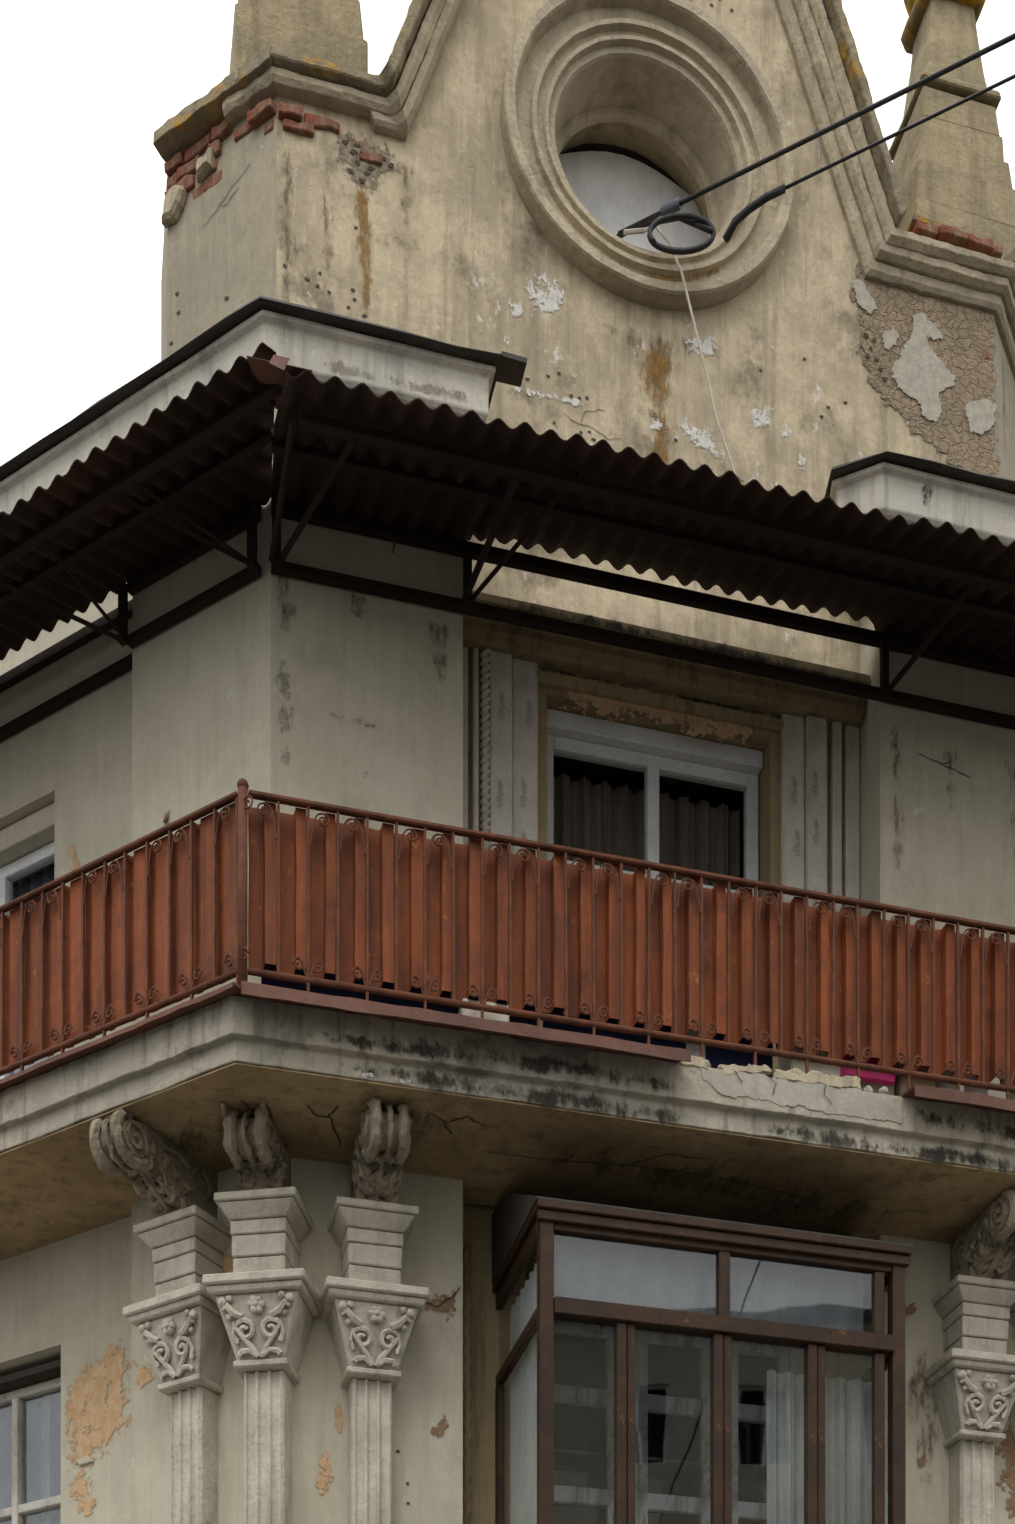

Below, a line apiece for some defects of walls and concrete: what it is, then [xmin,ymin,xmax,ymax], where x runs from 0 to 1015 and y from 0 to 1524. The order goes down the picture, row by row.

flaking render [161,98,400,229]
flaking render [906,214,1003,259]
flaking render [849,261,1003,478]
leakage [326,1034,676,1125]
spalling [677,1056,902,1124]
flaking render [62,1338,154,1518]